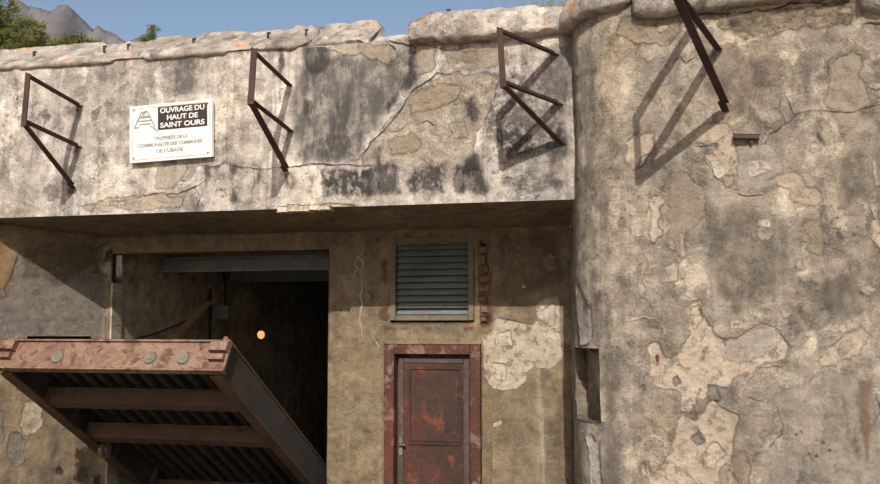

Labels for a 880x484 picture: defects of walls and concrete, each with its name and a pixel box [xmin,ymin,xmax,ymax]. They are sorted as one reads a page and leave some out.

crack [109,71,459,208]
water stain [294,46,407,158]
water stain [321,149,445,197]
water stain [454,153,488,193]
water stain [467,97,478,120]
peeling [625,130,656,169]
peeling [689,122,823,205]
crack [765,95,879,142]
peeling [0,241,127,340]
peeling [482,295,563,390]
spalling [640,299,791,484]
peeling [0,400,43,468]